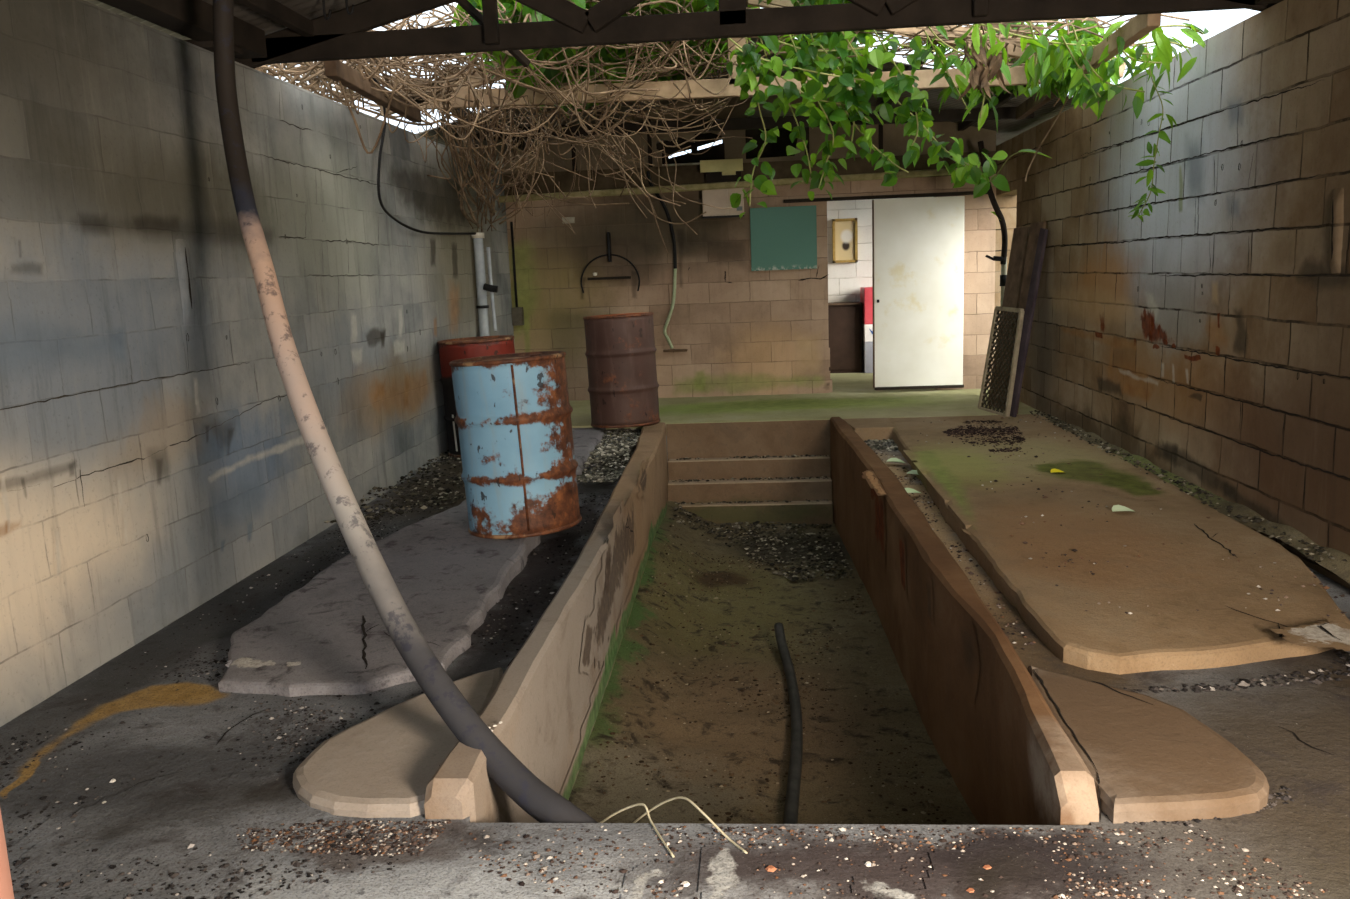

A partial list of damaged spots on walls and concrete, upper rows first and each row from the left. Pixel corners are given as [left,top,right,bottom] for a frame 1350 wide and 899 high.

corrosion [1134,304,1181,353]
corrosion [360,358,435,431]
crack [1194,524,1232,554]
crack [361,615,394,669]
spalling [1271,620,1350,651]